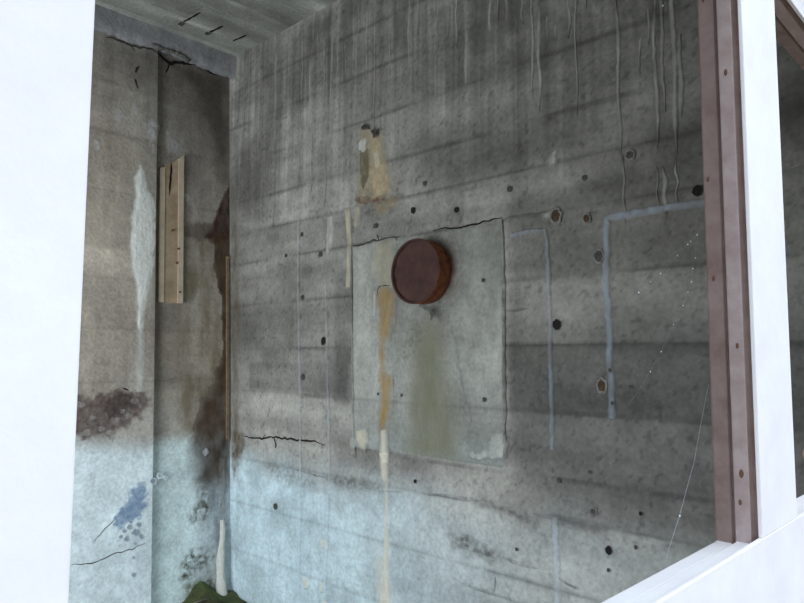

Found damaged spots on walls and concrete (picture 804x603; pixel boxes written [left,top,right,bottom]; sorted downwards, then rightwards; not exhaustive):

crack [106,37,228,78]
spalling [353,121,403,219]
water stain [76,159,156,444]
crack [350,236,400,445]
crack [244,434,401,502]
corrosion [349,235,398,603]
crack [72,544,143,565]